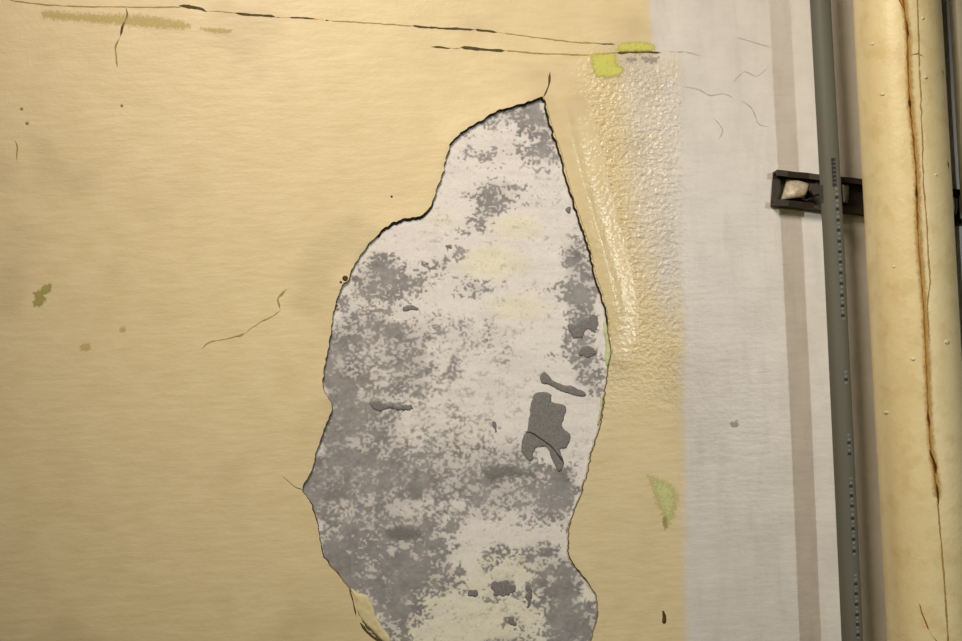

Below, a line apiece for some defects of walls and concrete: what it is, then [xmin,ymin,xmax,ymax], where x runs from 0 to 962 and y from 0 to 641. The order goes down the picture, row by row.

crack [11,0,700,97]
crack [683,38,770,127]
crack [203,289,287,348]
peeling [302,97,612,641]